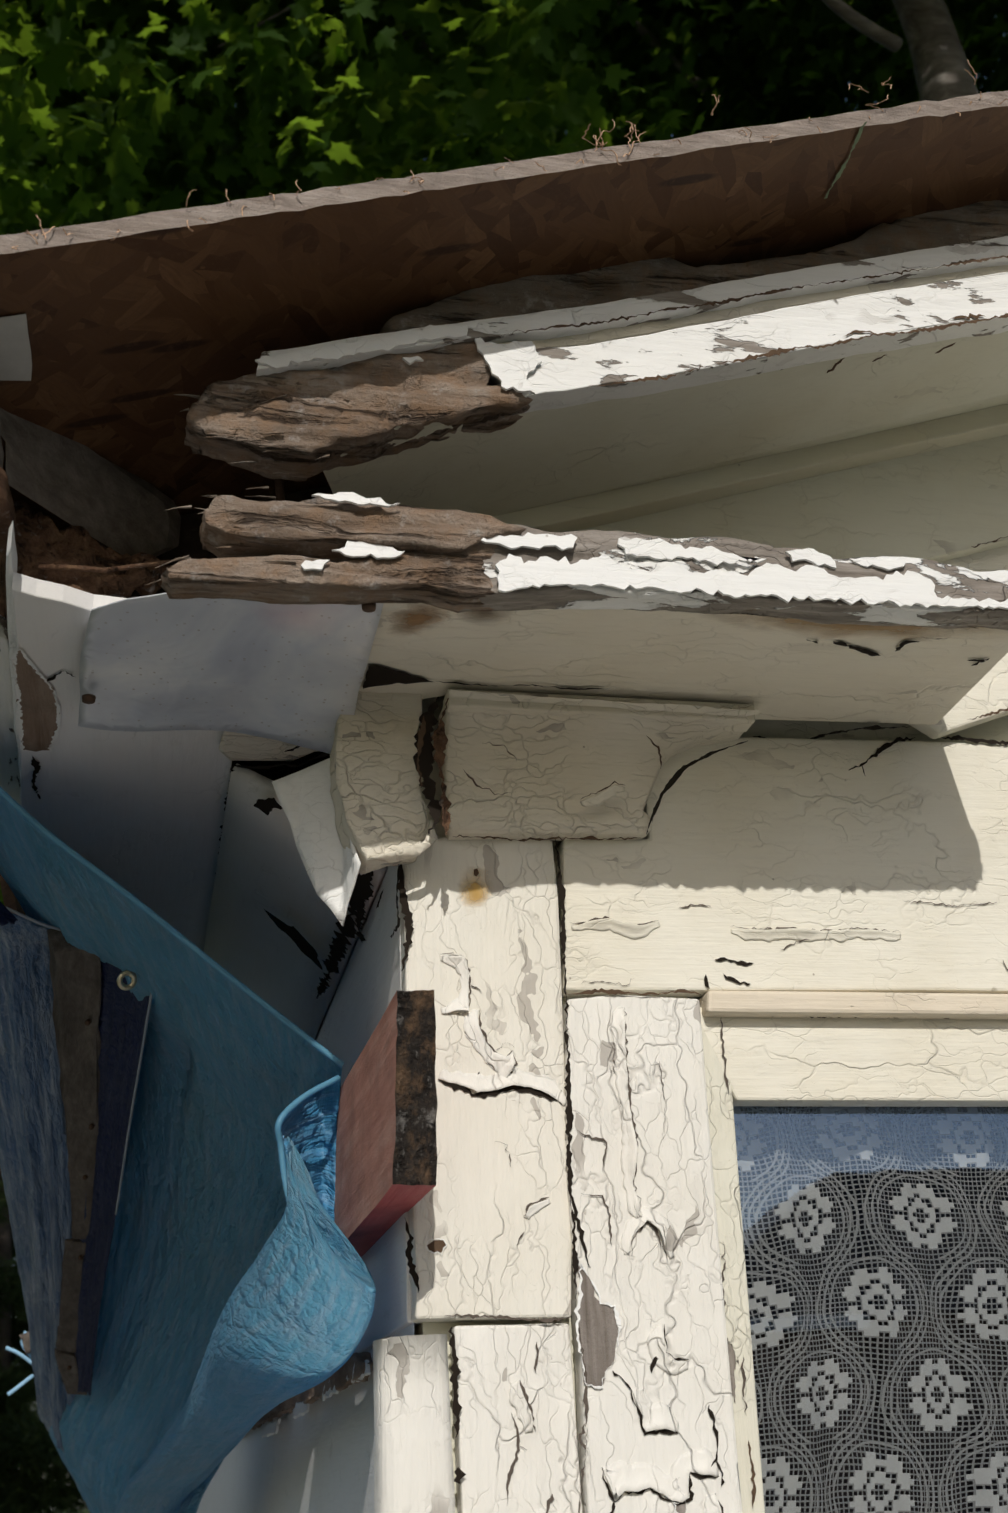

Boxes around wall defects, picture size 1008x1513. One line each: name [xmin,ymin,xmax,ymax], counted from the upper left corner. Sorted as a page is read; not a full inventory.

peeling [255,324,542,395]
peeling [312,492,400,508]
peeling [301,540,405,571]
peeling [481,532,1008,610]
crack [806,626,989,666]
peeling [11,649,61,752]
crack [413,681,609,835]
crack [647,736,662,769]
crack [810,708,1008,775]
crack [580,781,625,807]
crack [316,839,997,1513]
peeling [262,1360,371,1437]